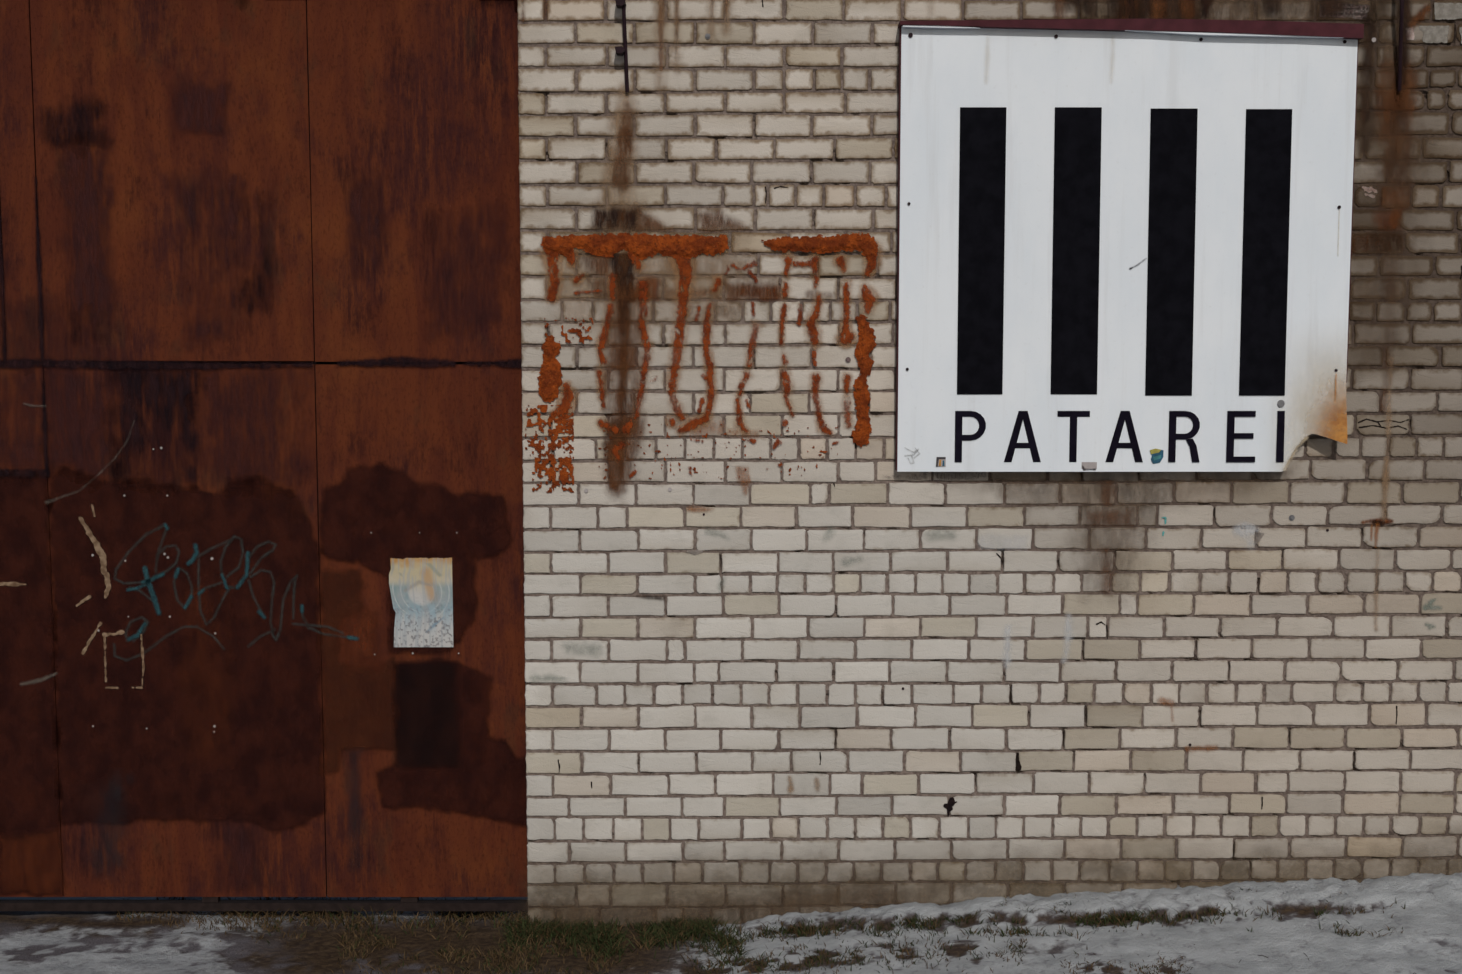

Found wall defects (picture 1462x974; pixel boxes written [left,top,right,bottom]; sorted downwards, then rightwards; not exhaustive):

corrosion [1056,0,1382,20]
corrosion [1352,61,1416,252]
corrosion [525,87,880,494]
corrosion [1362,458,1393,540]